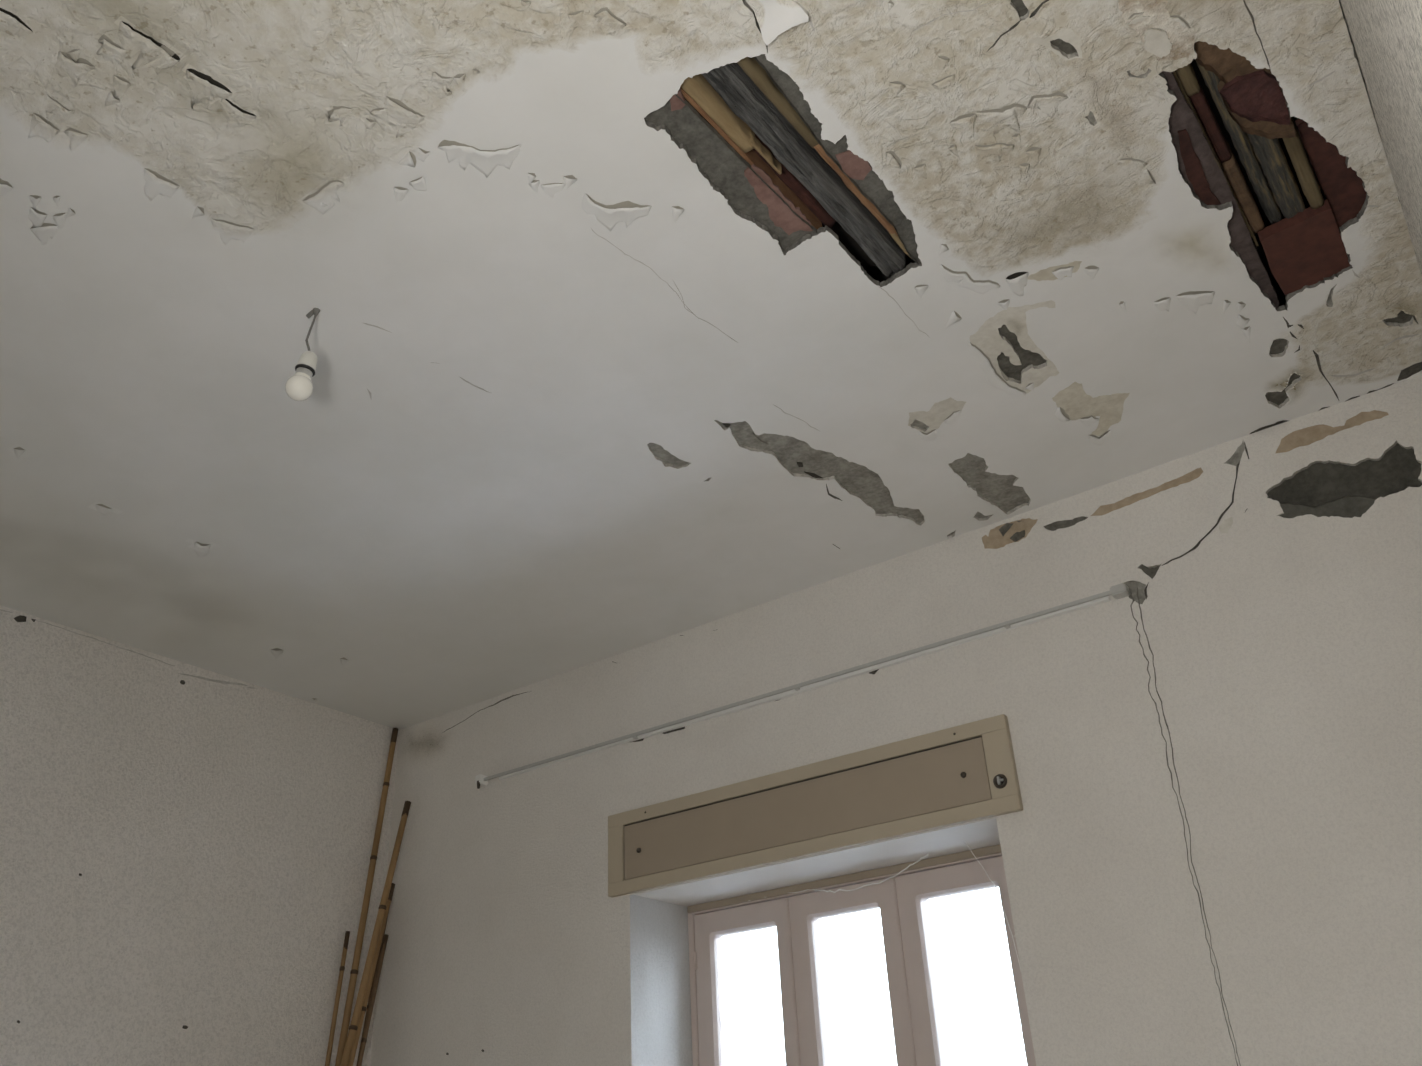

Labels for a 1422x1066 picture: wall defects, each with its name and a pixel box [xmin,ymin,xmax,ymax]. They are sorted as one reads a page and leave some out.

flaking render [1010,0,1030,21]
flaking render [1028,28,1082,60]
peeling [1118,0,1197,99]
spalling [1169,122,1369,311]
flaking render [644,89,1129,445]
peeling [1154,291,1251,343]
flaking render [647,443,691,469]
flaking render [714,420,925,526]
flaking render [949,453,1203,549]
peeling [1276,410,1389,453]
flaking render [1266,440,1422,518]
crack [1129,317,1422,1066]